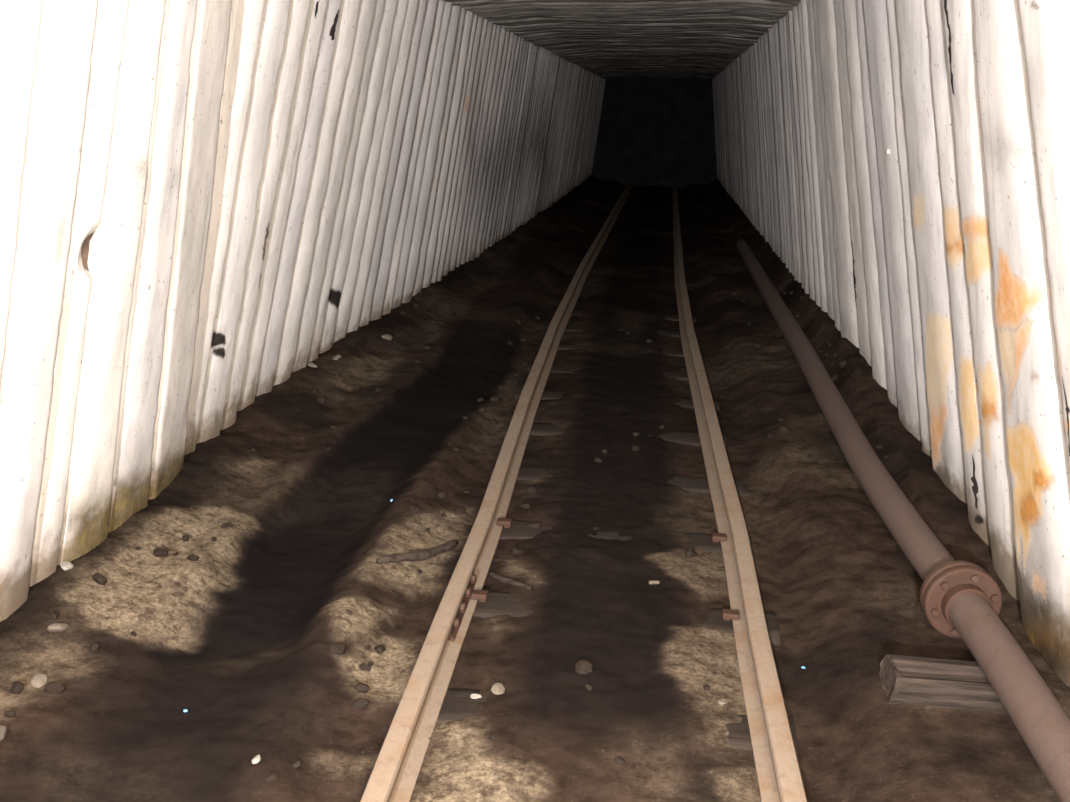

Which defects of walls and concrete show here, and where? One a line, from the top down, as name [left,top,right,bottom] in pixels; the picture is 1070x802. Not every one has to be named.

crack [944,0,955,98]
corrosion [924,197,1054,610]
crack [971,454,983,523]